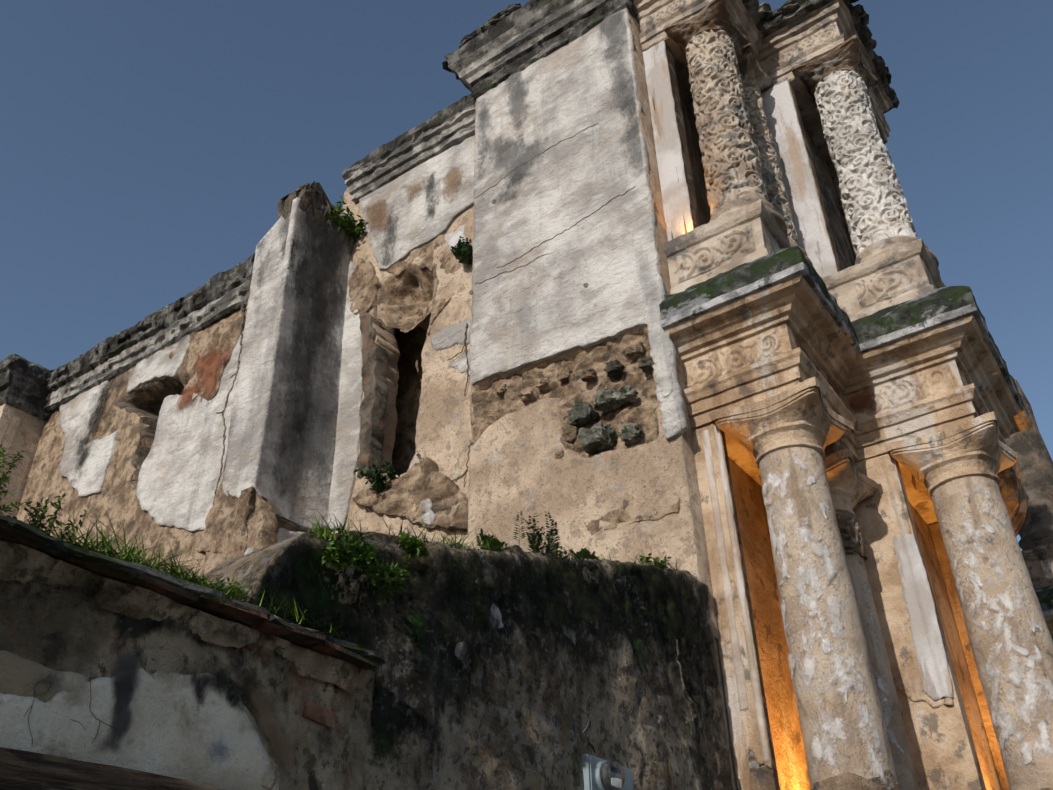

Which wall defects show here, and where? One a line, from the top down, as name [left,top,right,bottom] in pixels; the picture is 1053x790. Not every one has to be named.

leakage [478,71,541,201]
crack [475,123,598,198]
crack [475,186,635,284]
spalling [169,316,246,401]
crack [213,304,244,505]
leakage [275,210,349,497]
spalling [348,225,471,375]
spalling [469,330,682,459]
spalling [352,457,468,532]
crack [70,677,113,743]
leakage [105,651,140,749]
leakage [349,552,719,790]